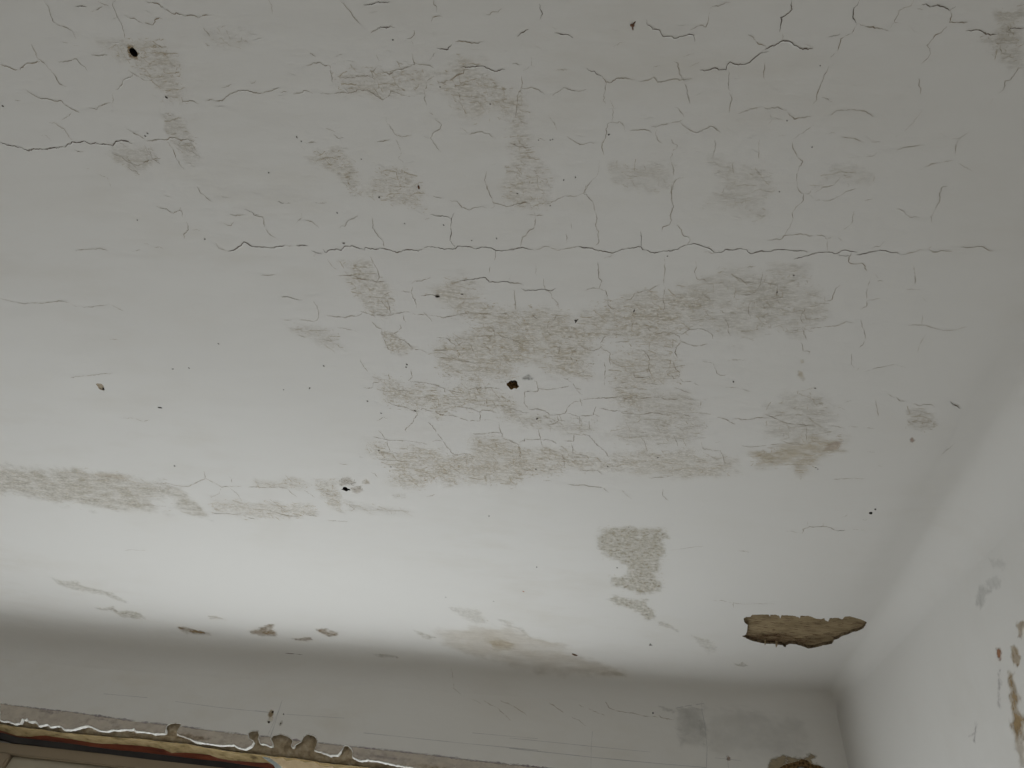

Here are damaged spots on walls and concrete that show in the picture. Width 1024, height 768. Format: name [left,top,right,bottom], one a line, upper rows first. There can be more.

crack [0,0,1024,522]
spalling [743,614,867,649]
spalling [0,719,412,768]